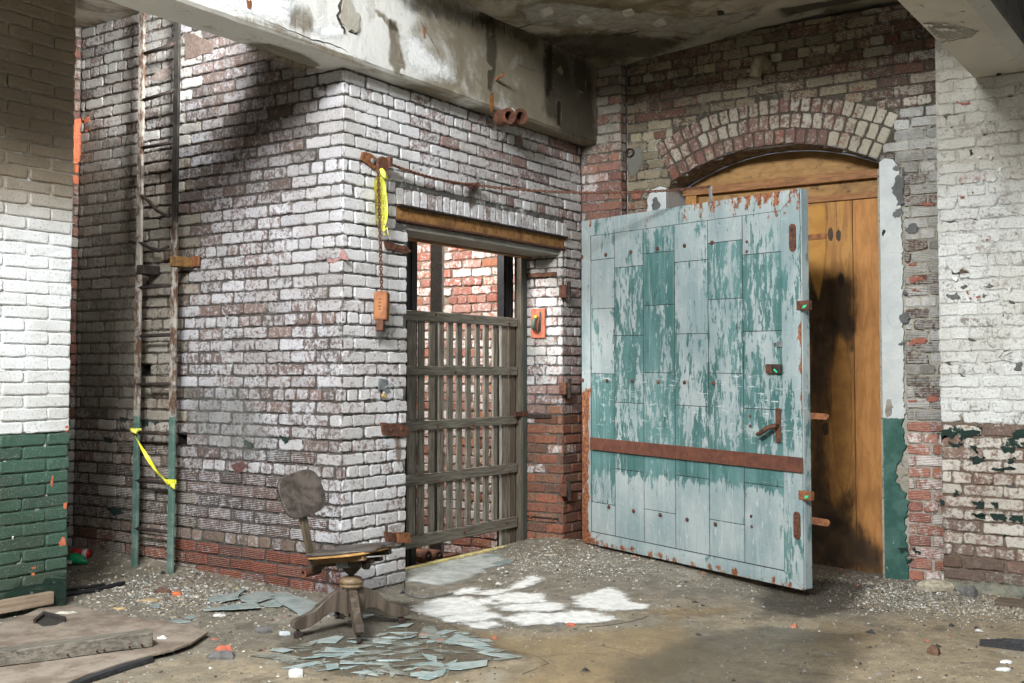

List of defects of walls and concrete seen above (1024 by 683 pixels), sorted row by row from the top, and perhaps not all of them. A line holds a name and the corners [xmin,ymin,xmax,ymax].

flaking render [336,0,360,35]
peeling [960,149,1003,199]
peeling [941,428,1024,471]
peeling [971,501,1024,523]